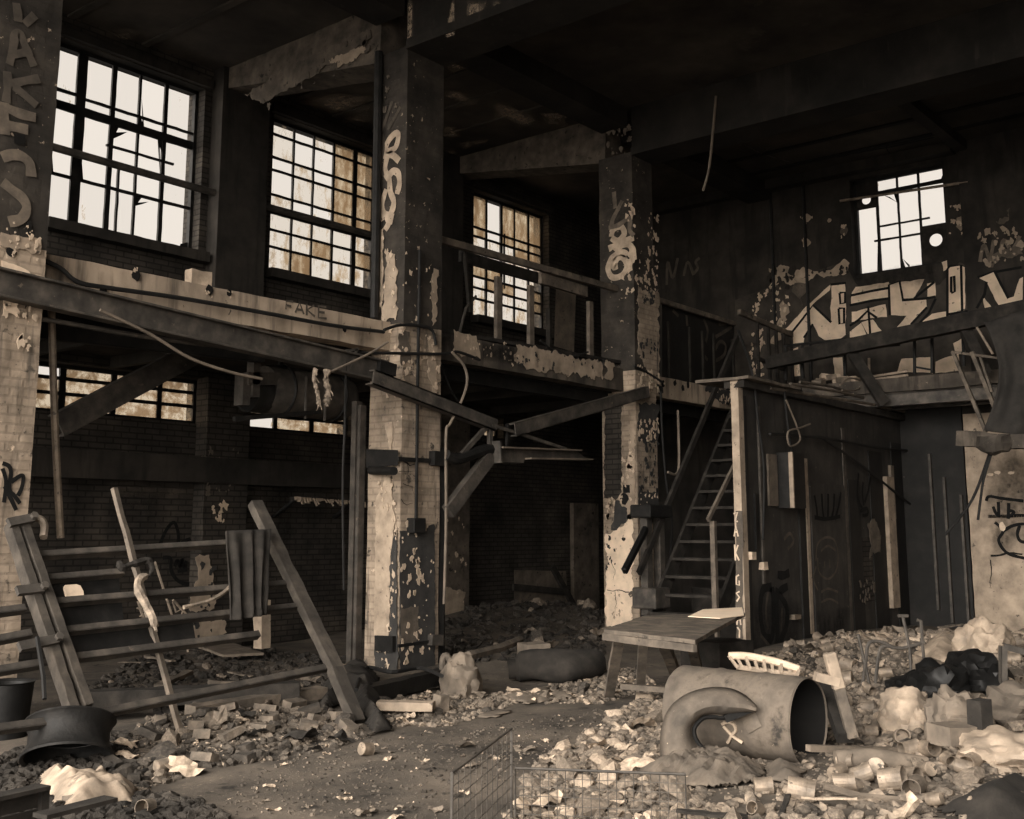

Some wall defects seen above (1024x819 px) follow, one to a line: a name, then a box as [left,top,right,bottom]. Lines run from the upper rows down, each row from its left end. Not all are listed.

peeling [245,29,372,111]
peeling [0,221,42,276]
peeling [977,208,1024,267]
peeling [2,300,38,321]
peeling [16,333,31,352]
peeling [379,228,440,393]
peeling [453,330,614,380]
peeling [749,259,850,376]
peeling [603,203,691,626]
peeling [705,386,731,405]
peeling [374,466,466,670]